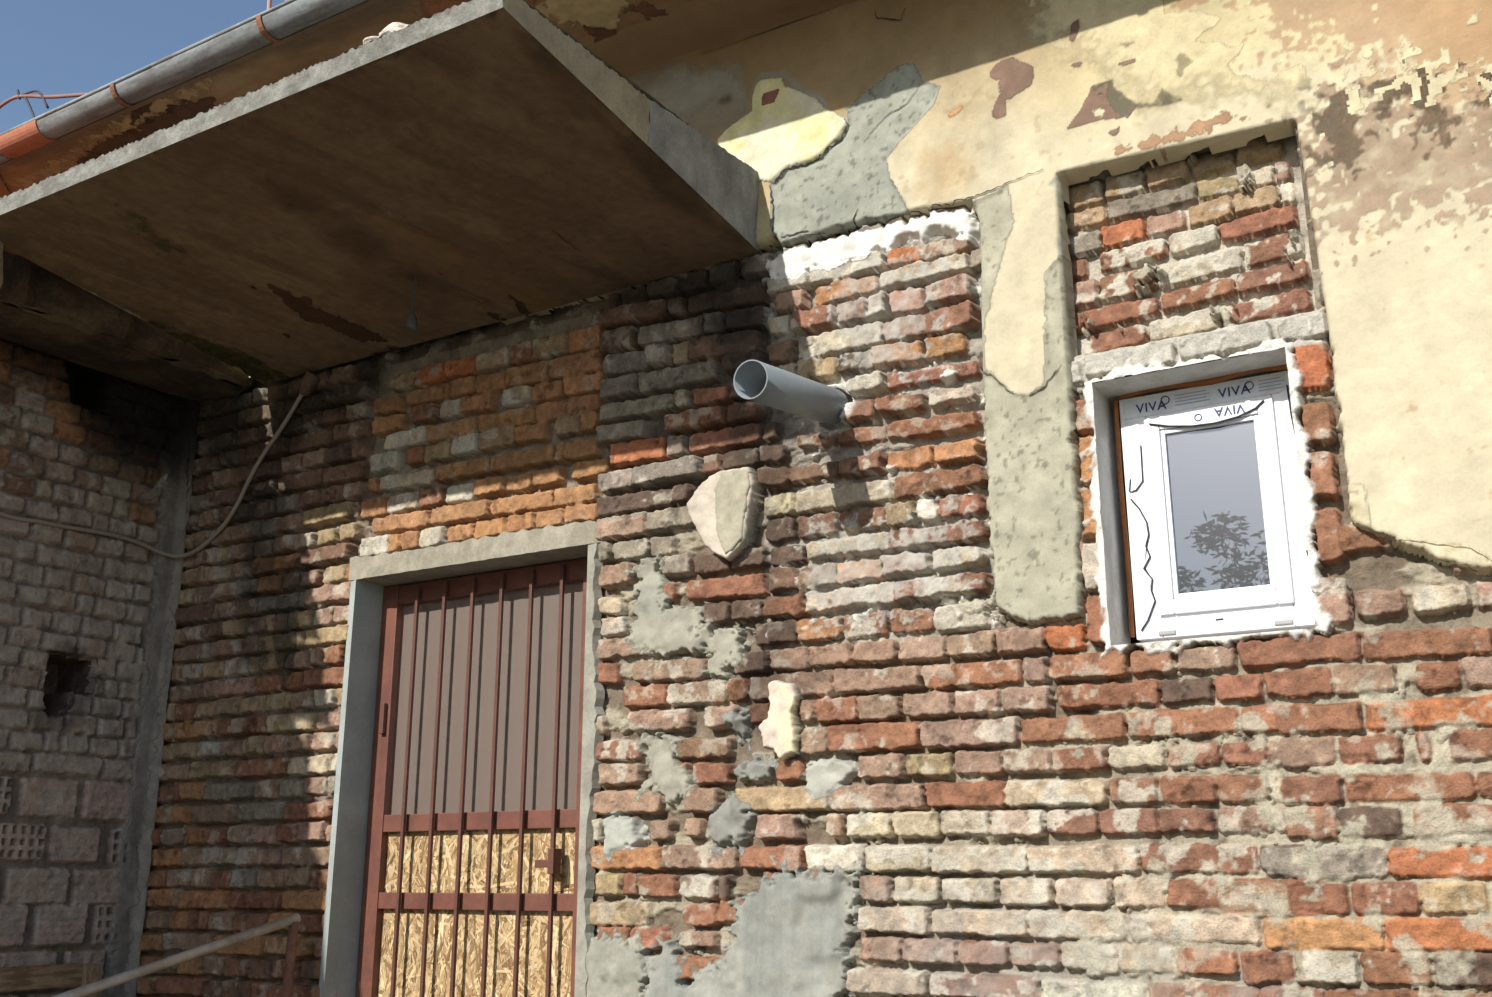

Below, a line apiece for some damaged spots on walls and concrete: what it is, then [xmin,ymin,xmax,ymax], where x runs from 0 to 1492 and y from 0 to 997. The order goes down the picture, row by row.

spalling [2,76,216,188]
spalling [718,64,962,248]
peeling [990,57,1034,119]
peeling [1027,0,1492,259]
spalling [973,184,1087,626]
spalling [1347,483,1492,576]